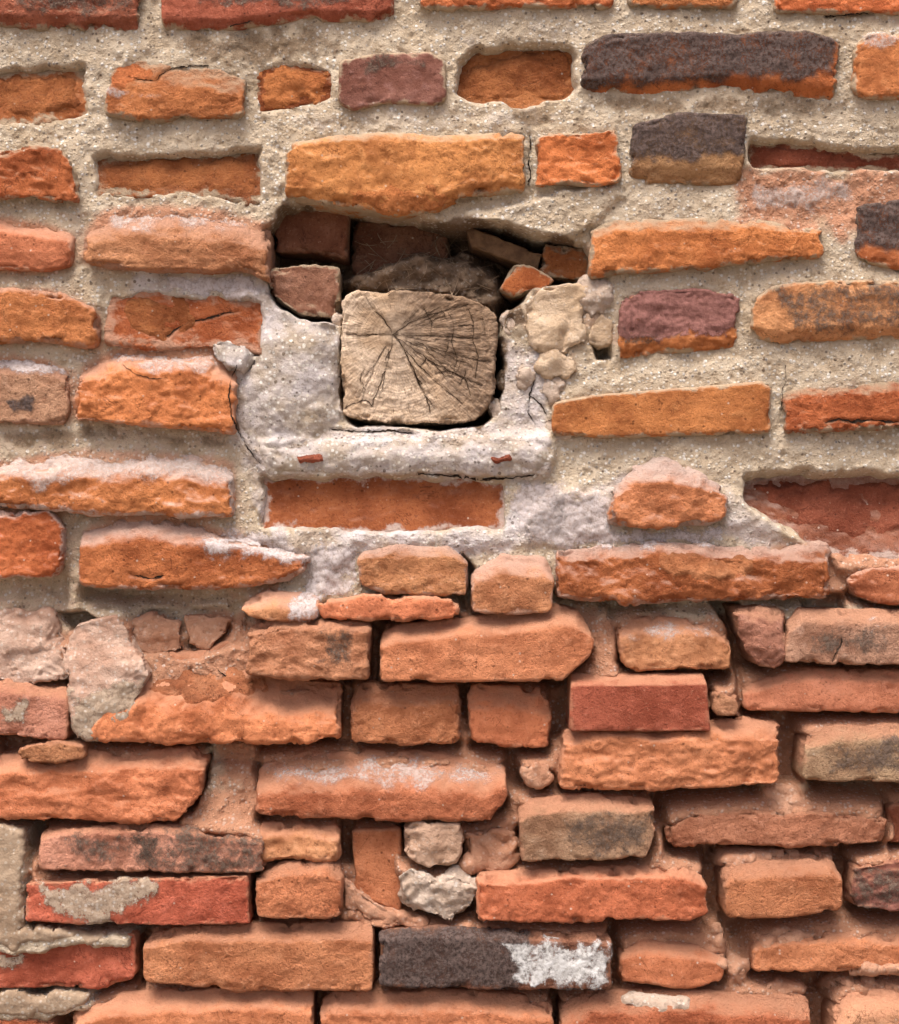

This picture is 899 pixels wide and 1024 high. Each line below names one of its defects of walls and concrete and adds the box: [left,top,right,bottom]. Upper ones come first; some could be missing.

crack [129,65,209,81]
crack [167,311,237,337]
crack [228,365,261,464]